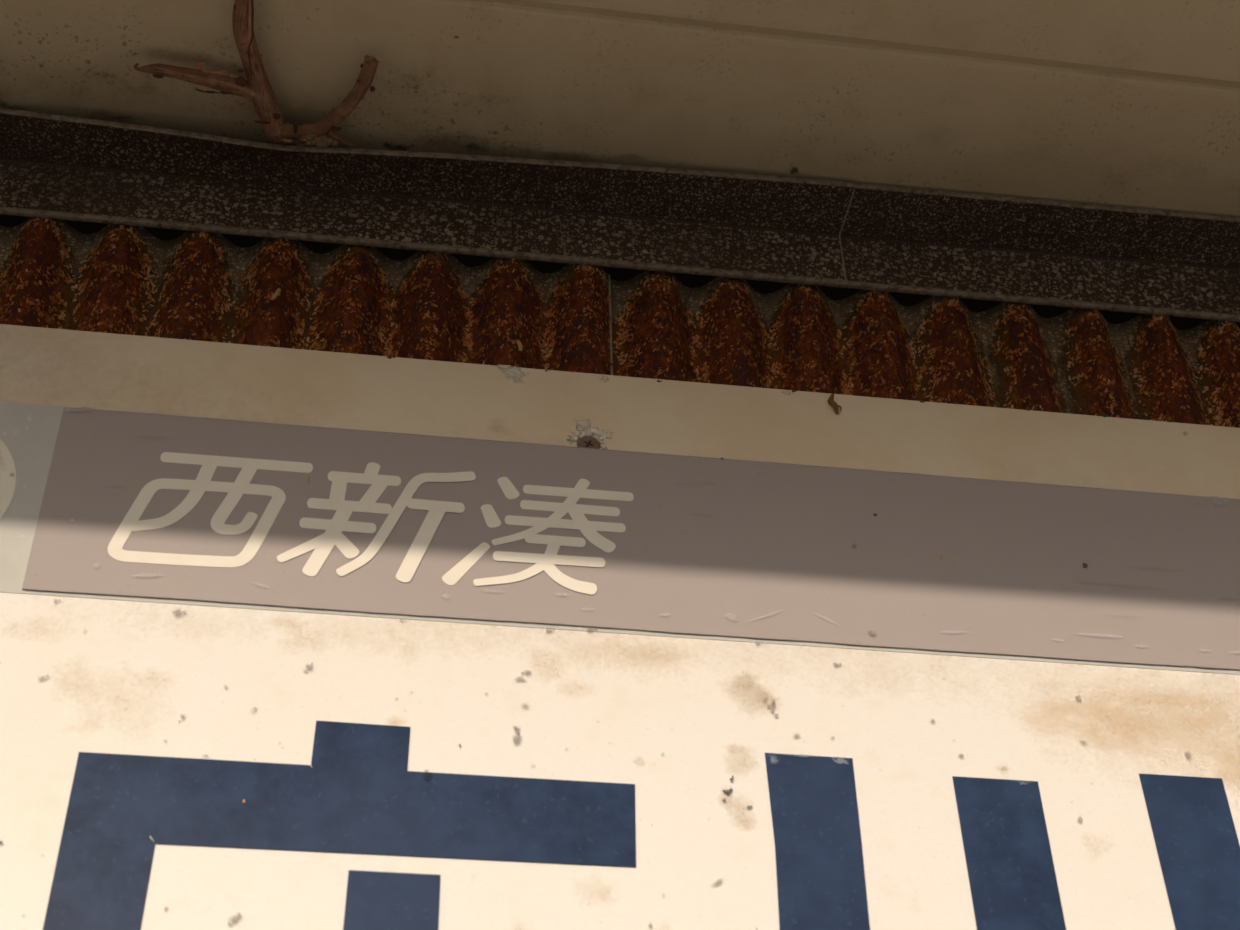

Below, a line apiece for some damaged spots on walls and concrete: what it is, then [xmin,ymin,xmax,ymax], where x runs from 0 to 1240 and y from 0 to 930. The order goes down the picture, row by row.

corrosion [0,217,1240,428]